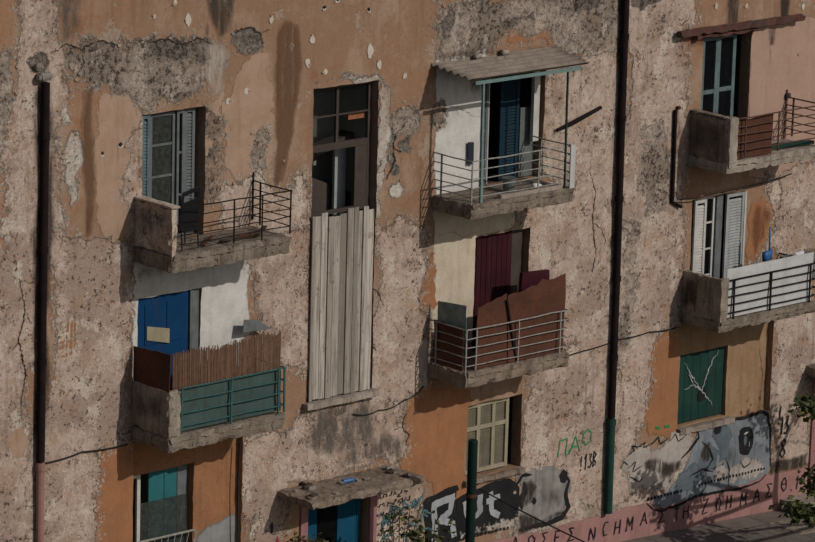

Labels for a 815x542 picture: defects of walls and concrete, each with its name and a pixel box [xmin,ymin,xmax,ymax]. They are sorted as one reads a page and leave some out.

damp [208,45,225,92]
damp [210,0,233,34]
damp [276,23,302,183]
damp [729,0,739,23]
crack [13,281,31,409]
flaking render [0,0,312,542]
flaking render [241,43,440,542]
flaking render [427,0,718,542]
flaking render [748,159,815,265]
flaking render [767,312,815,474]